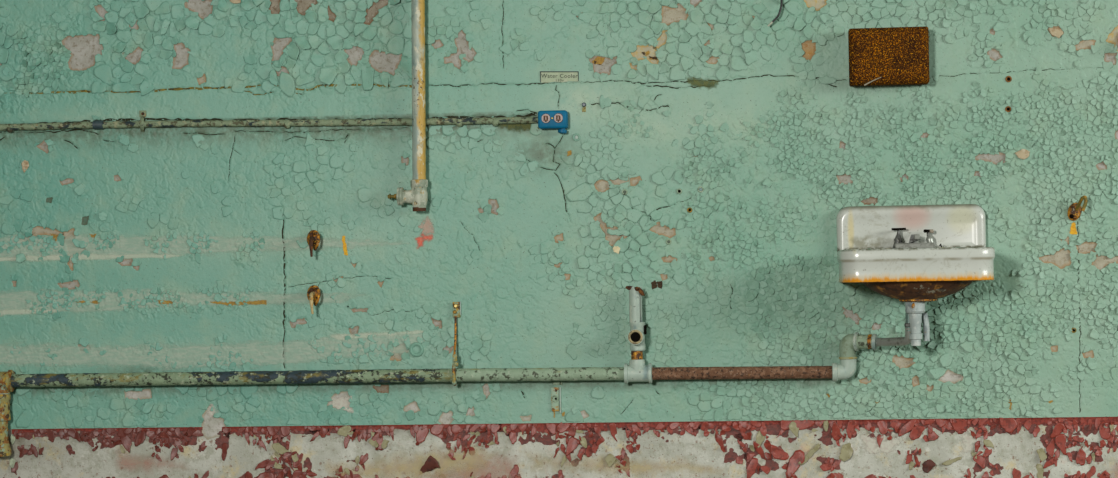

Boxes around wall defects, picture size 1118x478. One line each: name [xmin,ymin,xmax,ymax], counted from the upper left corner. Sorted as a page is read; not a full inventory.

crack [0,1,846,179]
peeling [0,211,254,321]
peeling [143,334,253,372]
crack [282,214,326,368]
peeling [263,133,361,274]
peeling [288,272,498,370]
peeling [398,116,539,176]
crack [526,134,571,221]
peeling [528,0,1118,478]